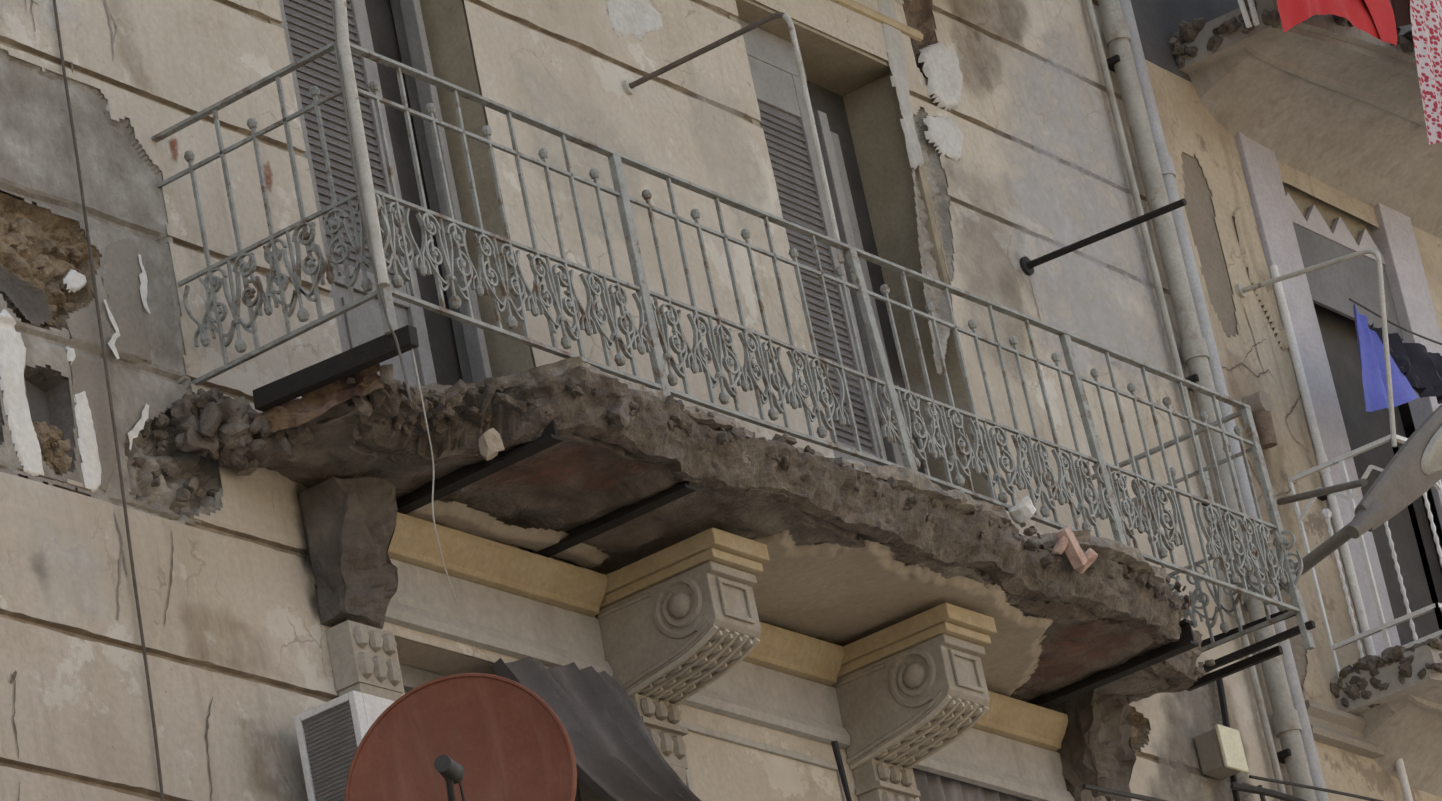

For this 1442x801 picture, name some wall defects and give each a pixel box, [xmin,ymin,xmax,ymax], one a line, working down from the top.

crack [104,0,117,62]
flaking render [902,0,938,79]
flaking render [0,48,224,525]
flaking render [1181,152,1239,338]
crack [114,512,128,620]
crack [164,530,174,625]
spalling [304,365,1203,757]
crack [10,670,20,801]
crack [205,697,213,801]